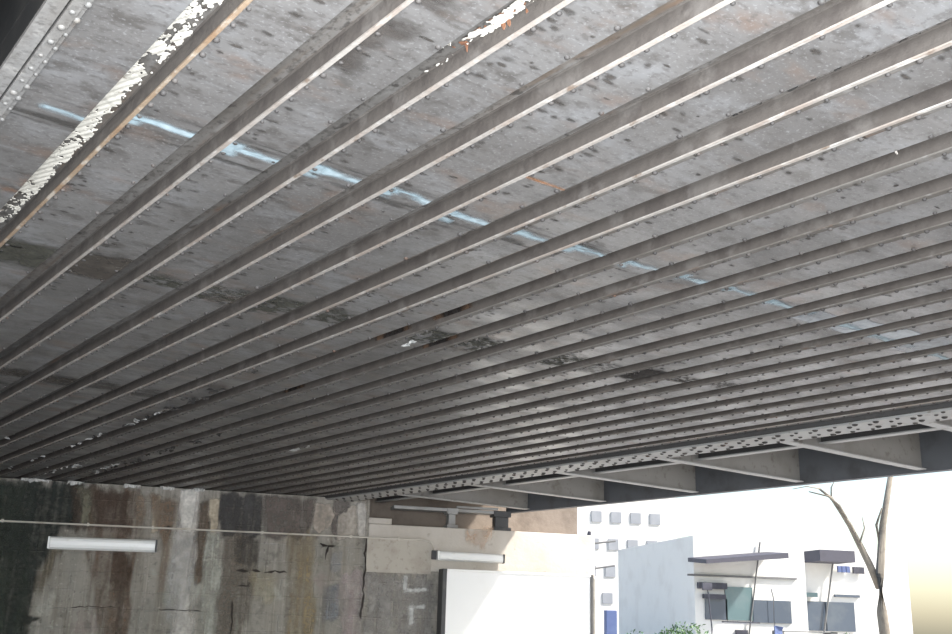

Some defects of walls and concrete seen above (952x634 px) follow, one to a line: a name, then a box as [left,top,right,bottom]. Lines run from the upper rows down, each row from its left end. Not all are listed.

peeling [424,0,534,72]
peeling [0,0,223,222]
water stain [0,478,96,634]
water stain [152,486,316,634]
water stain [332,500,350,540]